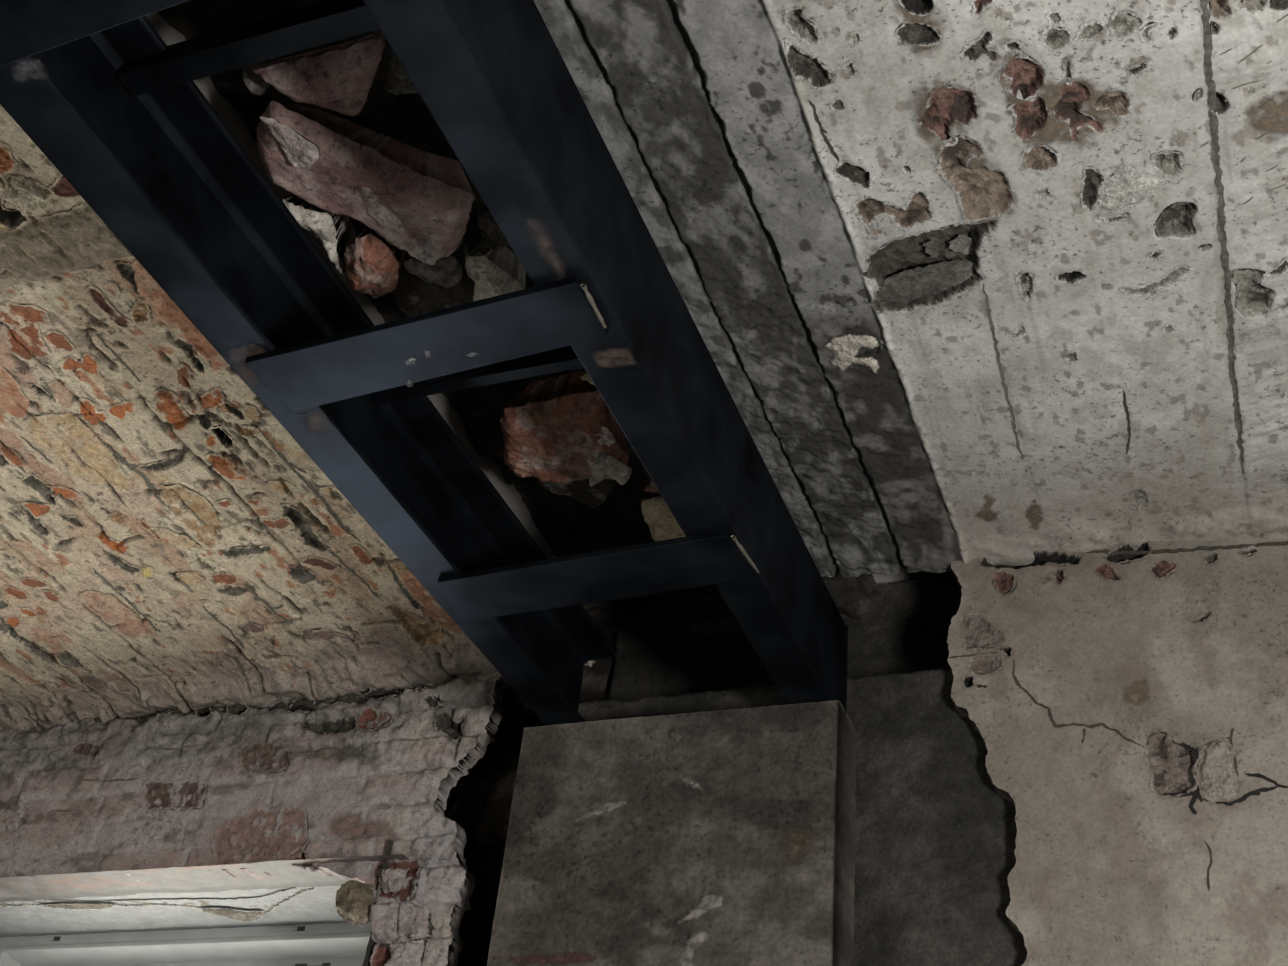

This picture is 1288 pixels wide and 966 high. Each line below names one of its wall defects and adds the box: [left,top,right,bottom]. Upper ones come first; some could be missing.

flaking render [0,142,18,178]
flaking render [48,174,84,200]
crack [1200,0,1288,474]
flaking render [204,434,295,496]
flaking render [1,577,62,630]
flaking render [95,531,129,554]
flaking render [141,483,233,550]
flaking render [209,572,240,586]
flaking render [299,557,340,571]
flaking render [397,568,466,635]
crack [948,652,1288,892]
flaking render [369,859,430,966]